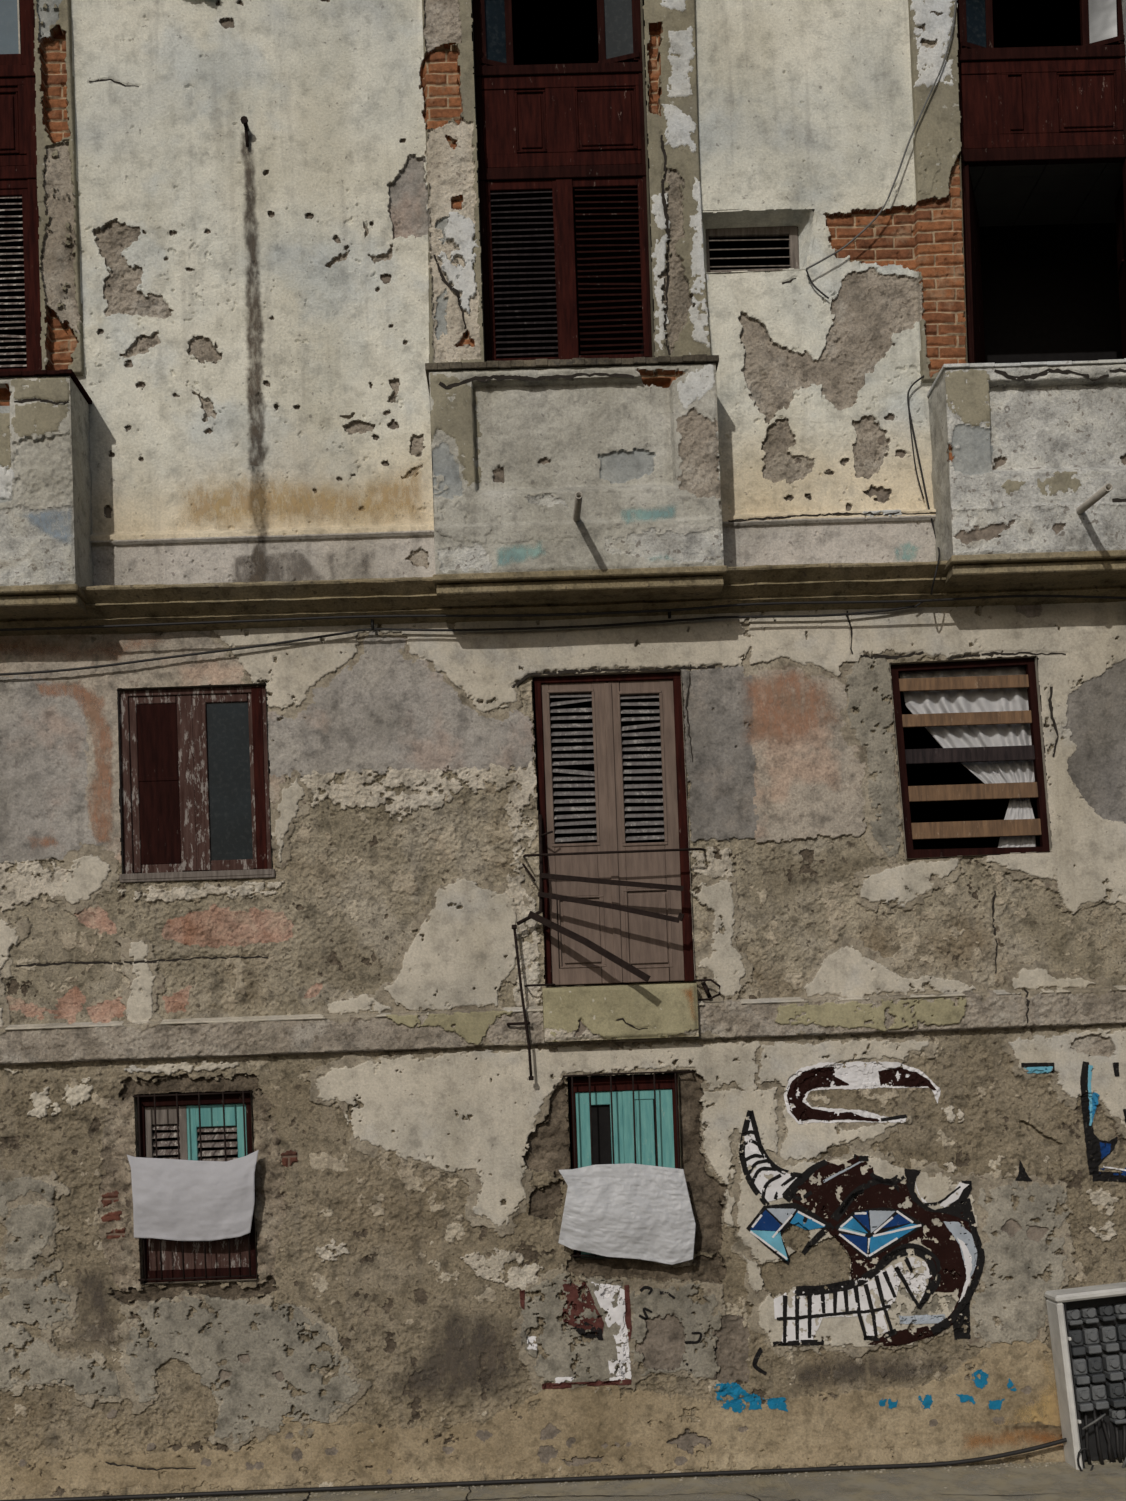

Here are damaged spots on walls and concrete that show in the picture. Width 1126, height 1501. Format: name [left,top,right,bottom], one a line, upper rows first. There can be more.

flaking render [37,24,71,143]
flaking render [92,218,173,368]
damp [241,134,266,468]
flaking render [325,235,350,268]
flaking render [340,0,724,573]
flaking render [738,155,992,501]
flaking render [0,306,79,586]
damp [235,534,318,582]
damp [192,481,413,518]
flaking render [951,455,1126,555]
flaking render [209,601,1126,914]